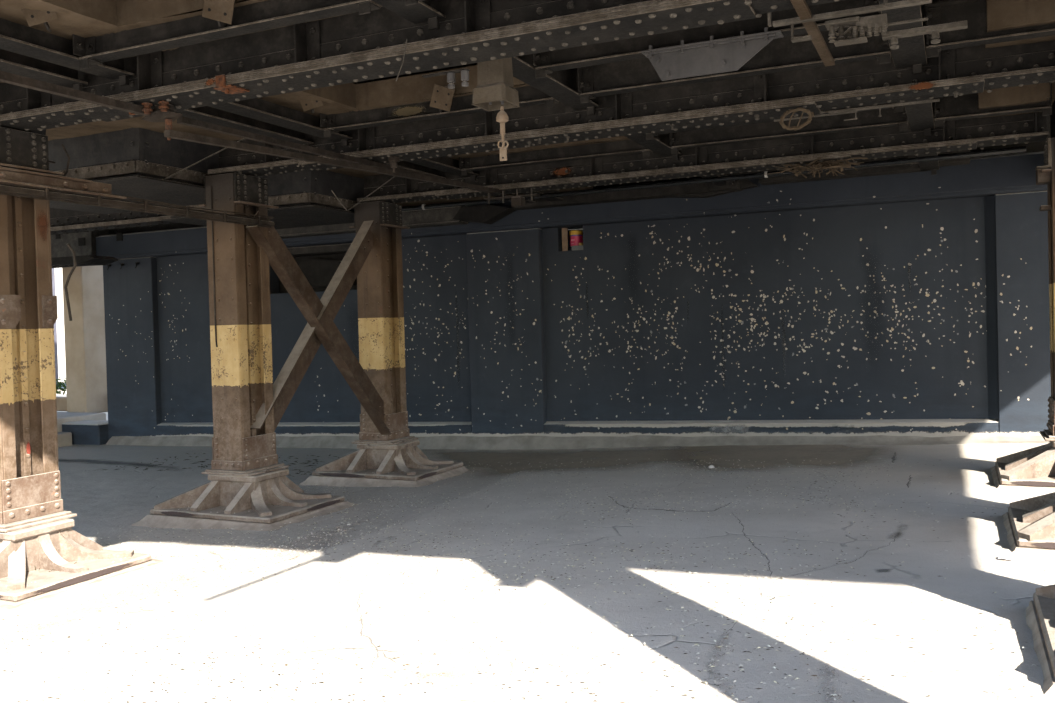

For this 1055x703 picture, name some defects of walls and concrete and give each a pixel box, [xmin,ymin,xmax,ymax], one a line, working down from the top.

peeling [403,233,556,430]
peeling [554,225,986,432]
crack [696,630,747,701]
crack [799,651,848,703]